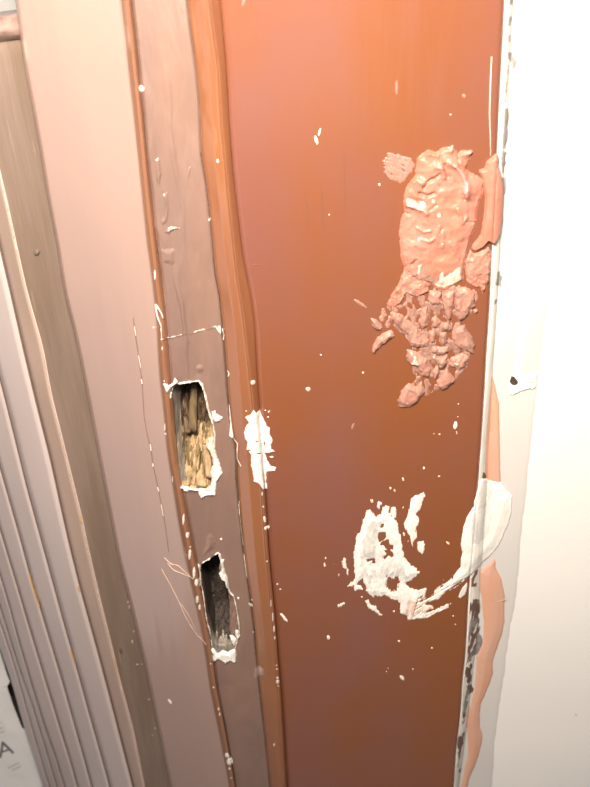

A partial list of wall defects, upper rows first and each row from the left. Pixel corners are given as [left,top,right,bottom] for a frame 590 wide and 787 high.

peeling [244,410,276,489]
peeling [482,377,501,482]
peeling [403,492,425,554]
peeling [457,559,507,787]